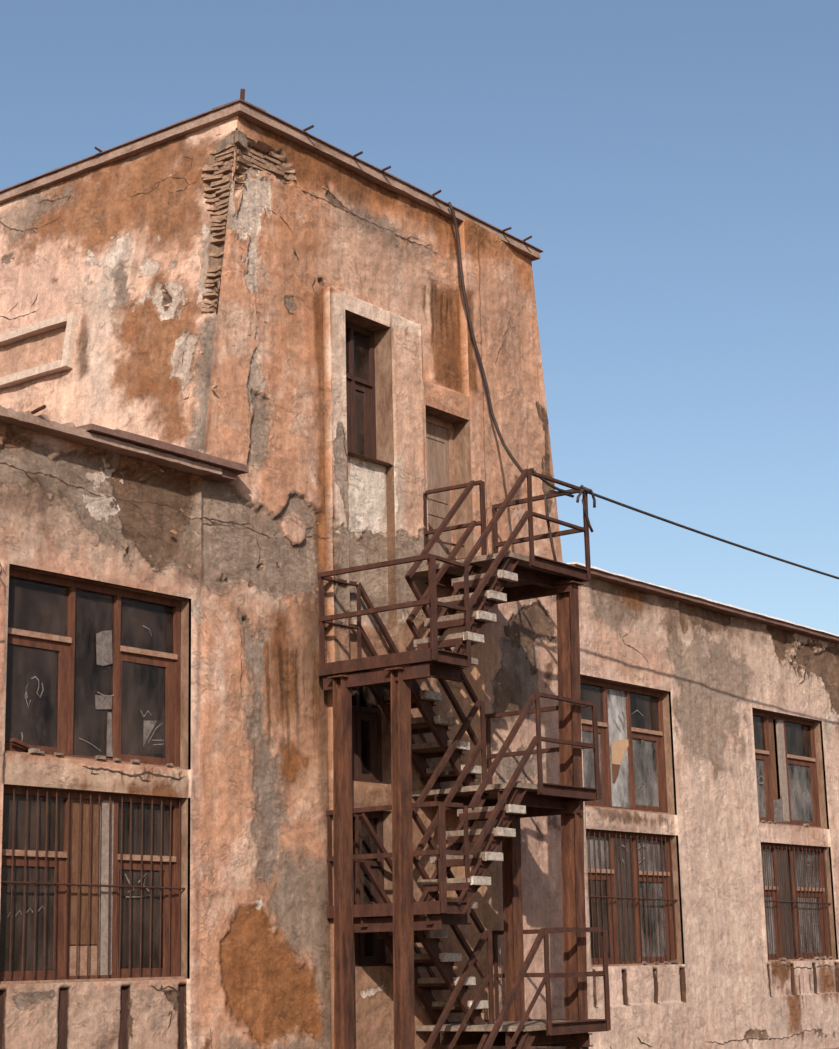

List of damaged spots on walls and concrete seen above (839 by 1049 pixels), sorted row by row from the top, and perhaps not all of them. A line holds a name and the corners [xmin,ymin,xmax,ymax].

crack [294,184,446,260]
flaking render [107,131,297,470]
damp [79,458,123,524]
crack [0,442,330,568]
flaking render [0,422,429,629]
flaking render [493,601,554,722]
flaking render [767,626,839,714]
peeling [220,610,331,1049]
crack [706,1029,818,1045]